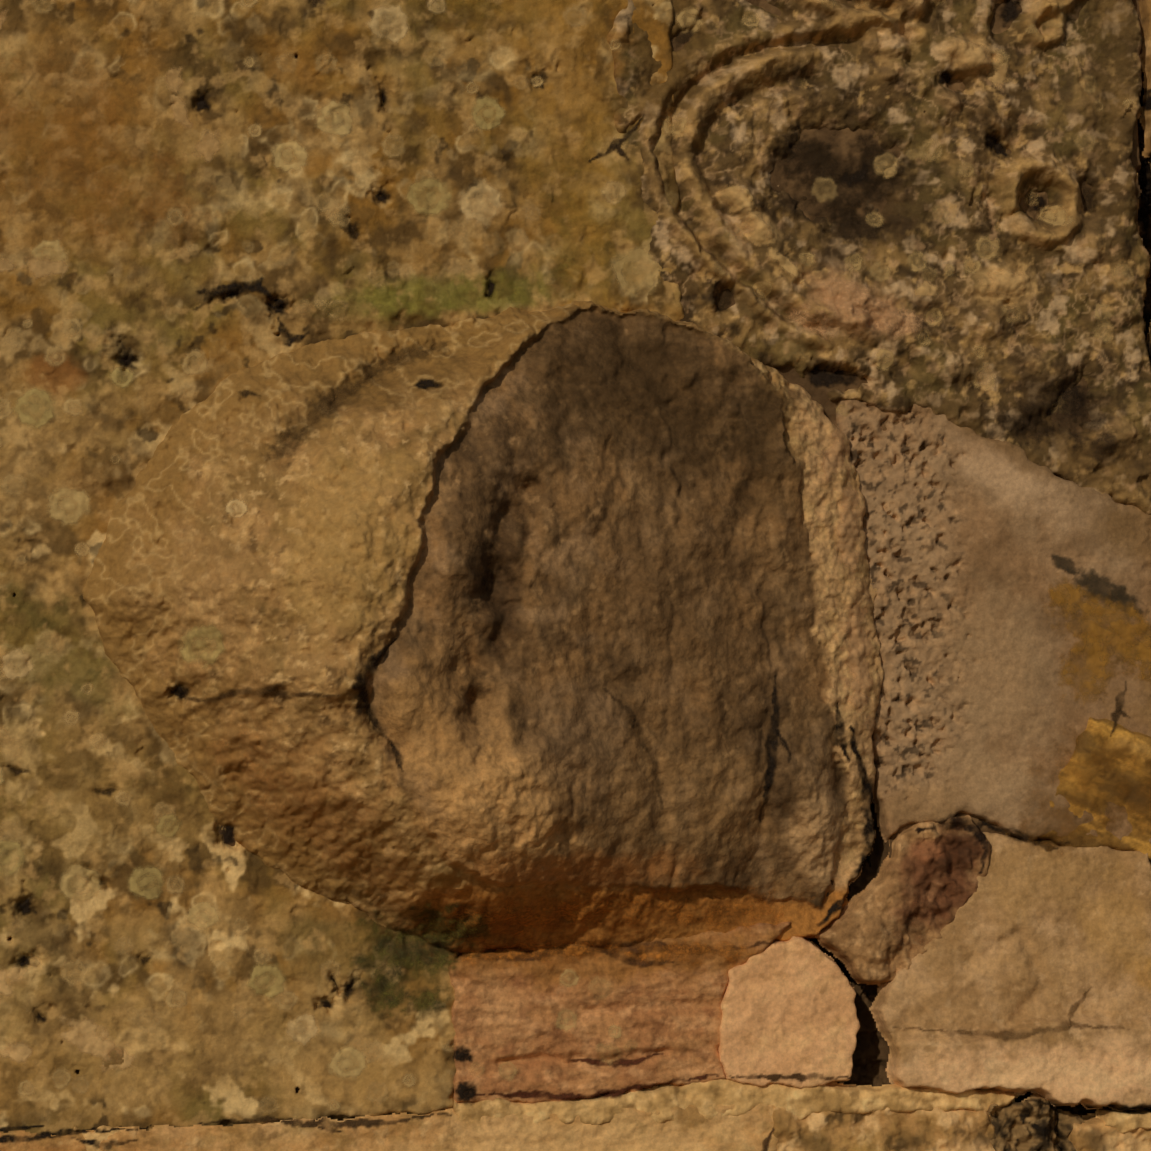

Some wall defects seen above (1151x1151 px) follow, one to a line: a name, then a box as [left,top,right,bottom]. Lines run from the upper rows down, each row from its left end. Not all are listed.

crack [188,639,402,768]